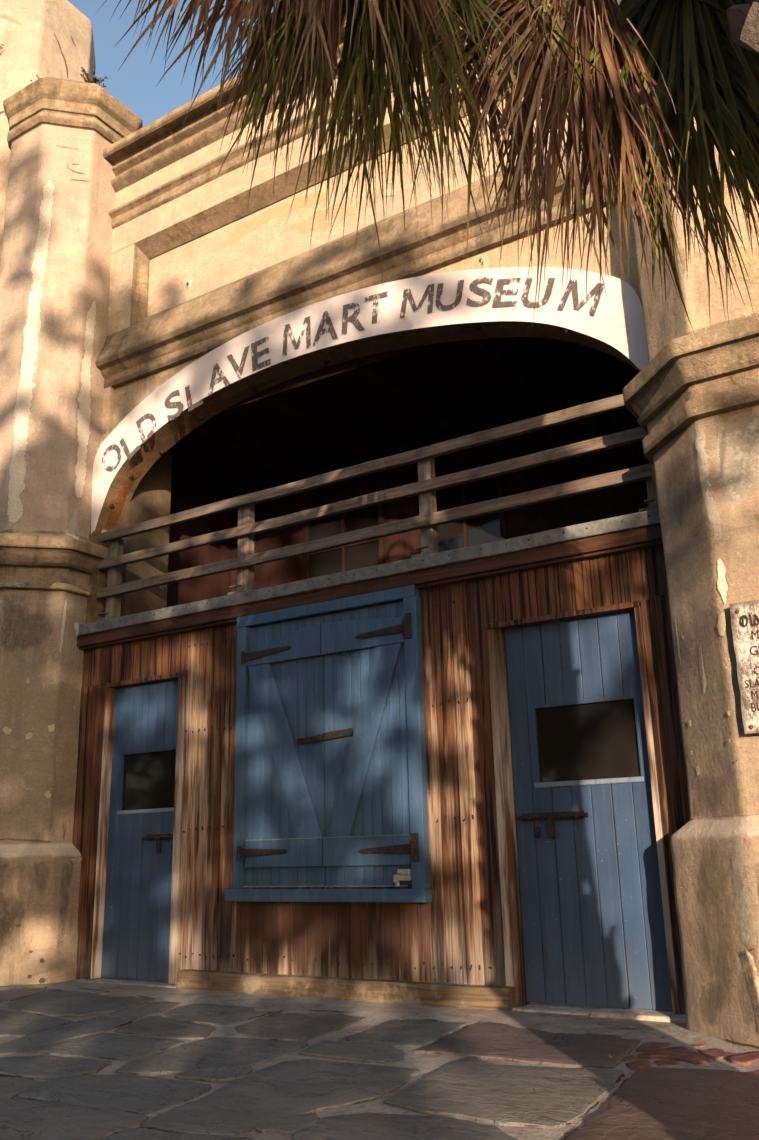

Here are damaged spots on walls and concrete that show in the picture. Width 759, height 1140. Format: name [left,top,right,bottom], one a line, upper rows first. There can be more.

peeling [7,180,55,523]
peeling [63,301,96,540]
peeling [696,435,720,536]
peeling [716,558,728,636]